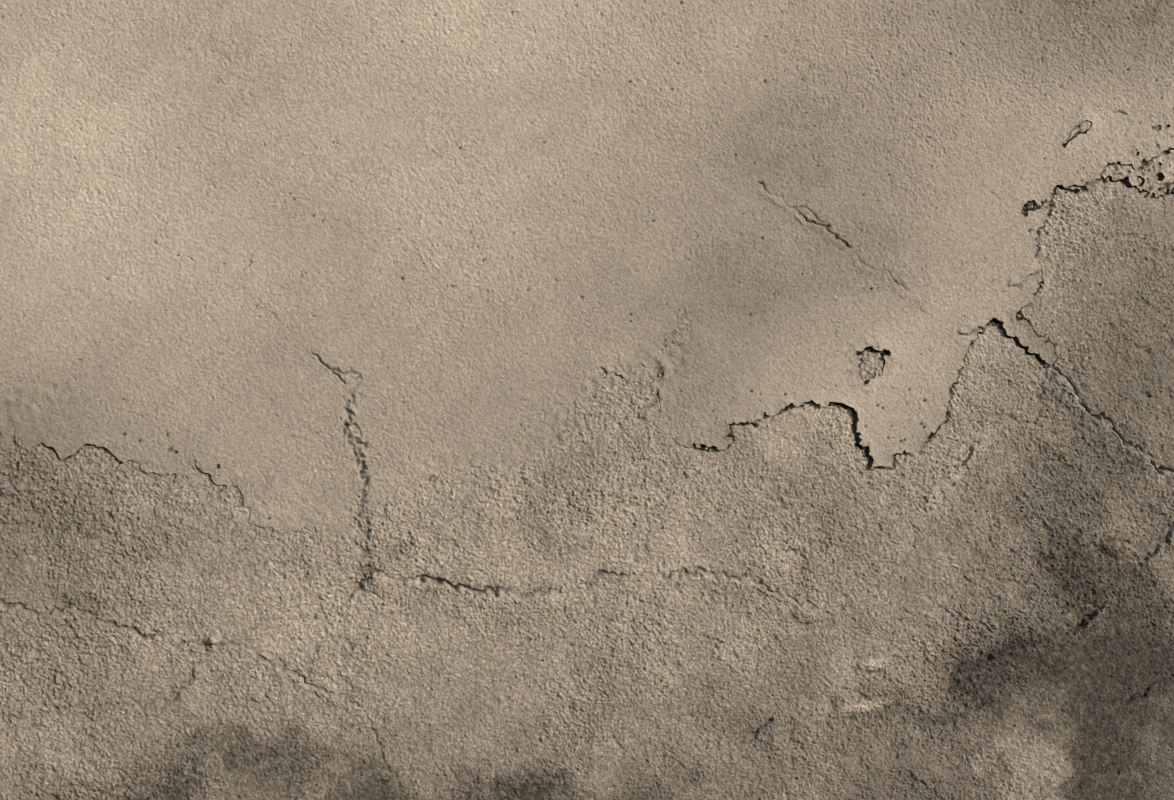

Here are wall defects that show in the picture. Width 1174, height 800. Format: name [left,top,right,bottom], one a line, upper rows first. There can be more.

crack [240,244,822,617]
flaking render [0,318,1083,800]
crack [752,177,933,319]
flaking render [981,105,1174,466]
flaking render [1105,467,1174,597]